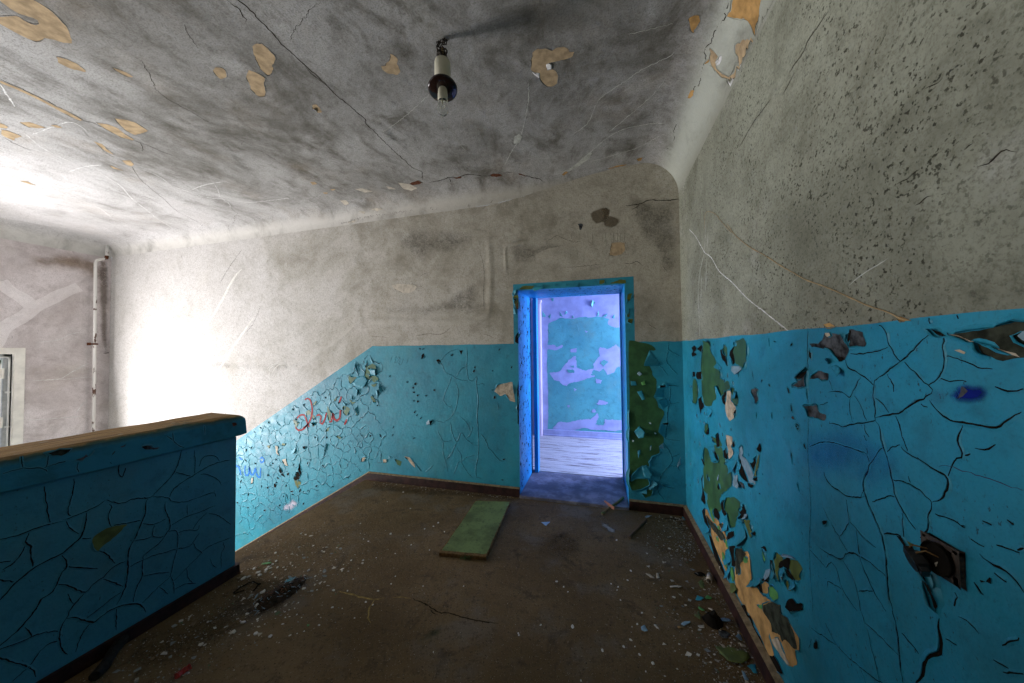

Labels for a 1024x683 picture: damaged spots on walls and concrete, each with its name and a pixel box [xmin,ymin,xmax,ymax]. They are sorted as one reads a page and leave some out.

peeling [0,123,22,140]
peeling [0,81,81,121]
crack [227,0,679,205]
leakage [591,209,618,227]
crack [0,337,387,682]
peeling [237,357,391,511]
peeling [491,279,669,498]
peeling [677,338,820,677]
crack [689,229,1024,683]
peeling [924,313,1024,361]